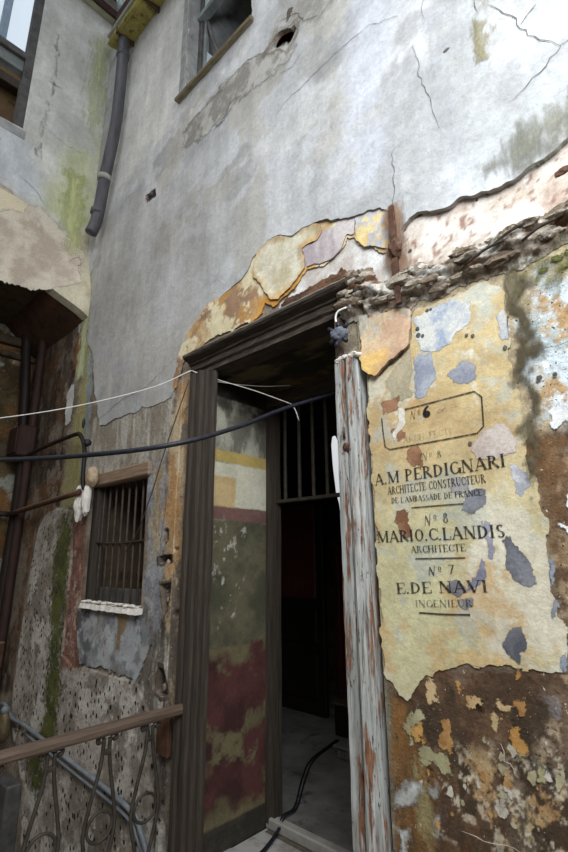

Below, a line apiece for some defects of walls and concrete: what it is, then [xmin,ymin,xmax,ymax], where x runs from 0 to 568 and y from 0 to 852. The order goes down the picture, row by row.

spalling [182,0,331,147]
crack [474,0,568,101]
peeling [0,185,85,291]
flaking render [173,209,392,389]
corrosion [383,203,409,306]
flaking render [77,579,171,682]
peeling [403,707,453,788]
peeling [425,677,438,705]
peeling [490,697,526,733]
peeling [487,727,529,829]
peeling [527,760,565,792]